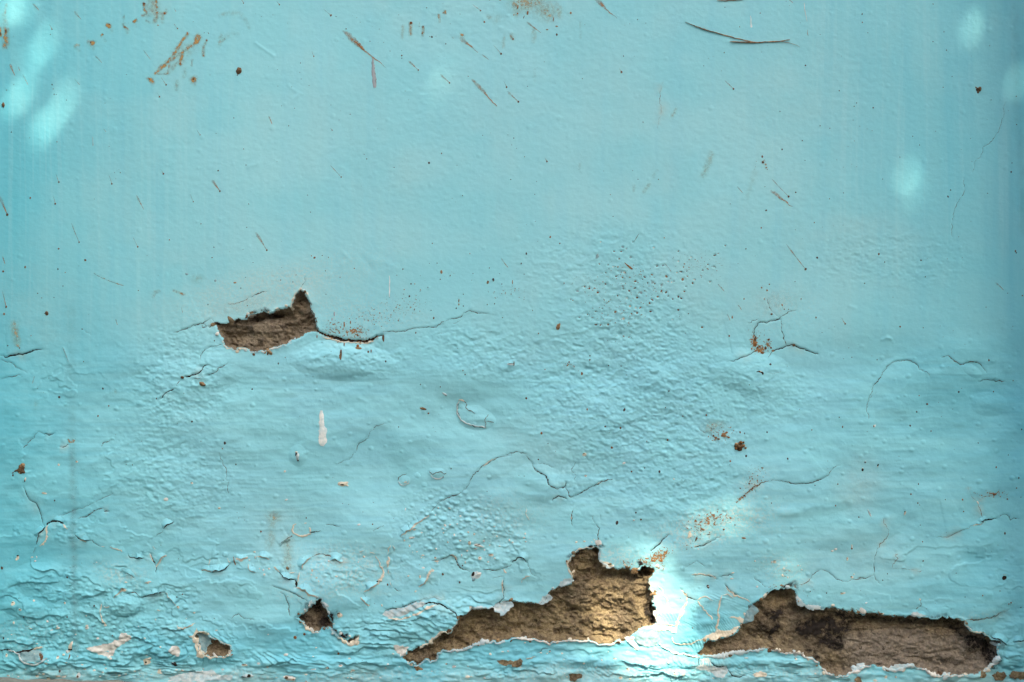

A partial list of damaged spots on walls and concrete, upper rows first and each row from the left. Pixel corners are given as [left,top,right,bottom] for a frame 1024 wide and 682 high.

rust [148,32,209,83]
spalling [210,287,319,355]
crack [317,311,487,344]
crack [733,299,818,362]
crack [866,355,1003,415]
crack [201,451,612,616]
spalling [118,598,360,682]
spalling [379,539,1024,682]